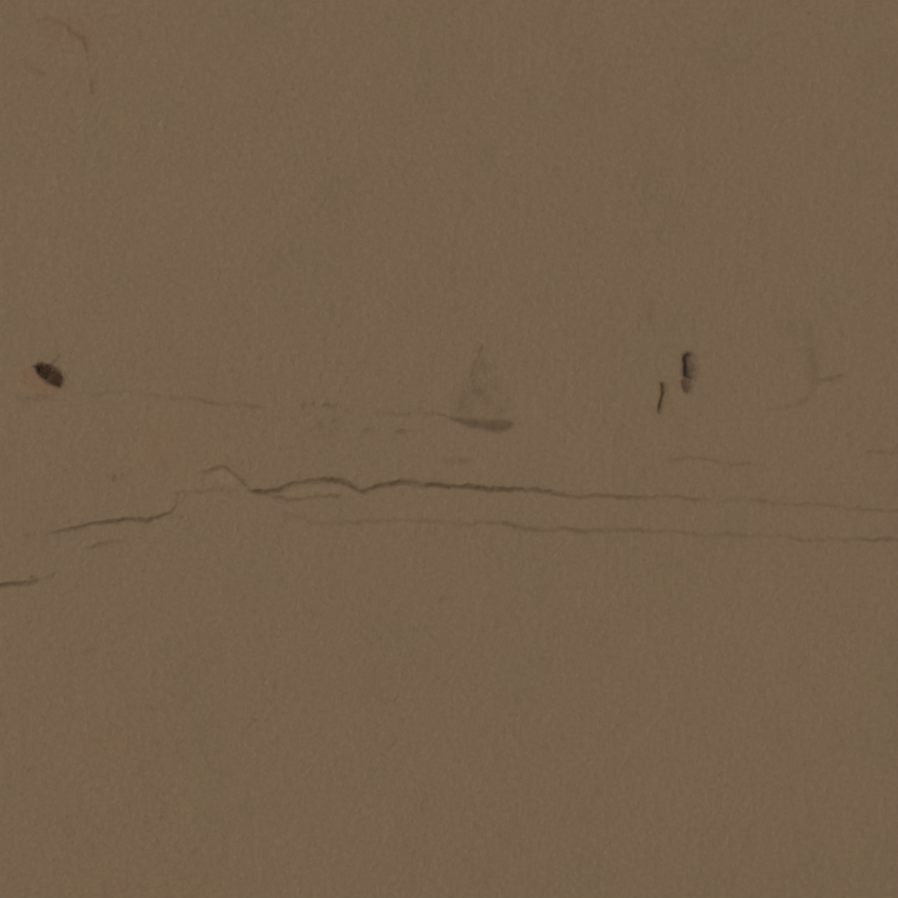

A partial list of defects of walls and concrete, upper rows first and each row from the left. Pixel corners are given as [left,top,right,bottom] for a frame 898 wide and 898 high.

crack [45,463,898,552]
crack [0,571,60,590]